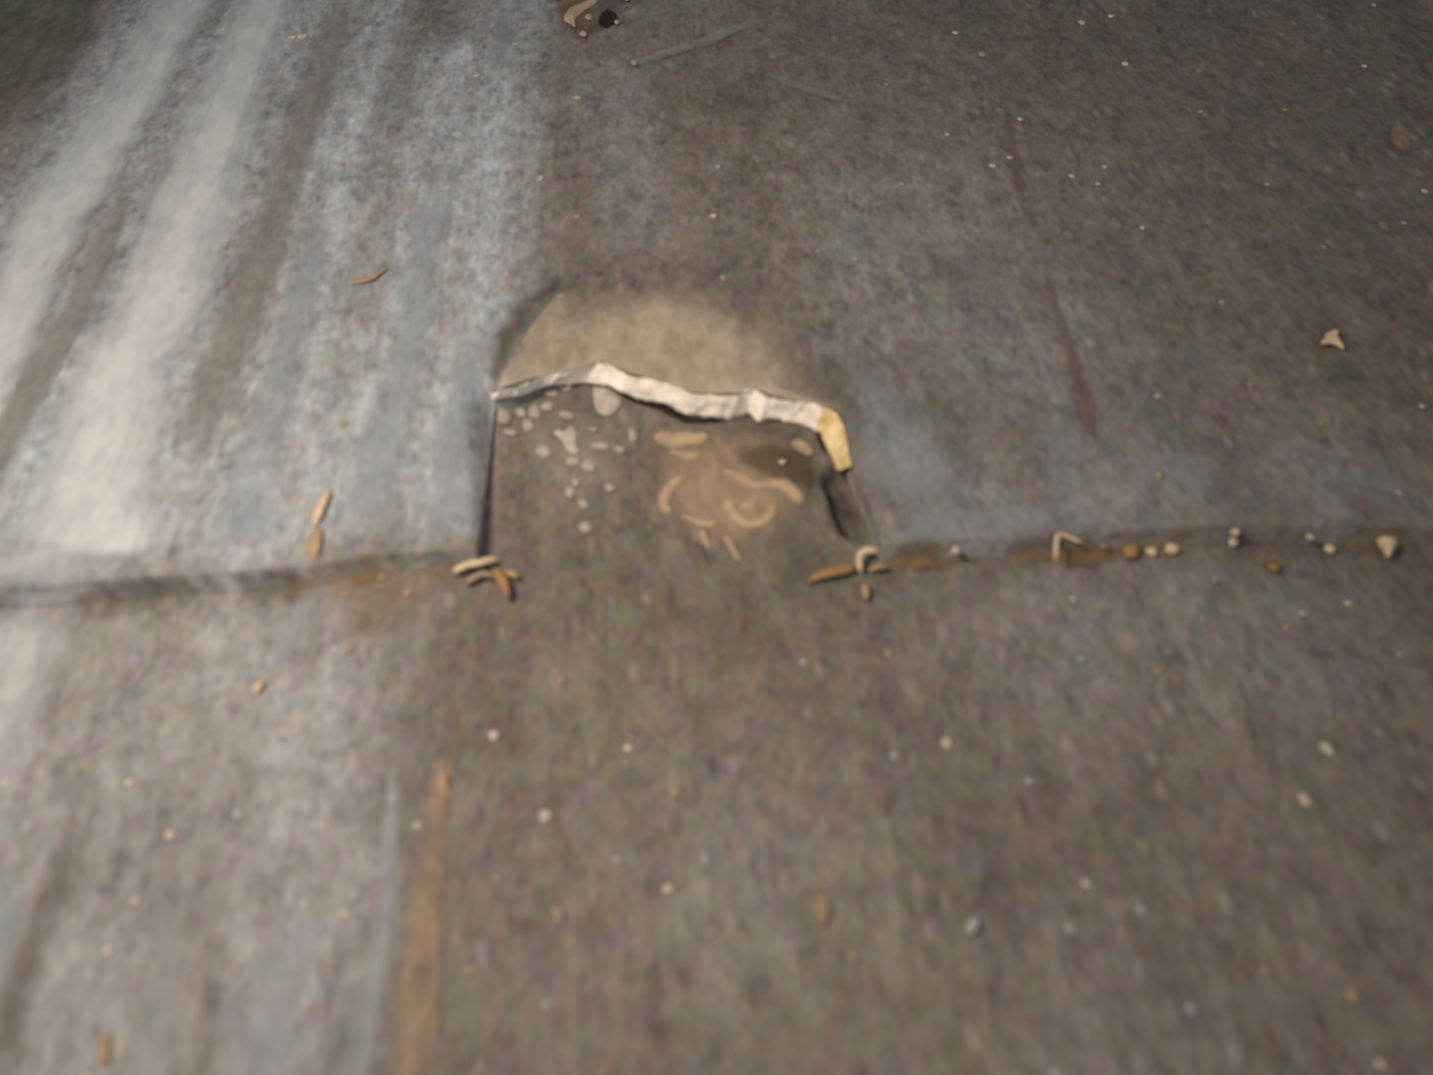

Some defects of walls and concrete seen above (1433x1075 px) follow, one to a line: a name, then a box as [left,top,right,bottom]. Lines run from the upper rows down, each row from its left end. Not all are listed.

damp [0,0,291,575]
spalling [491,296,851,532]
damp [0,623,59,748]
damp [398,760,449,1075]